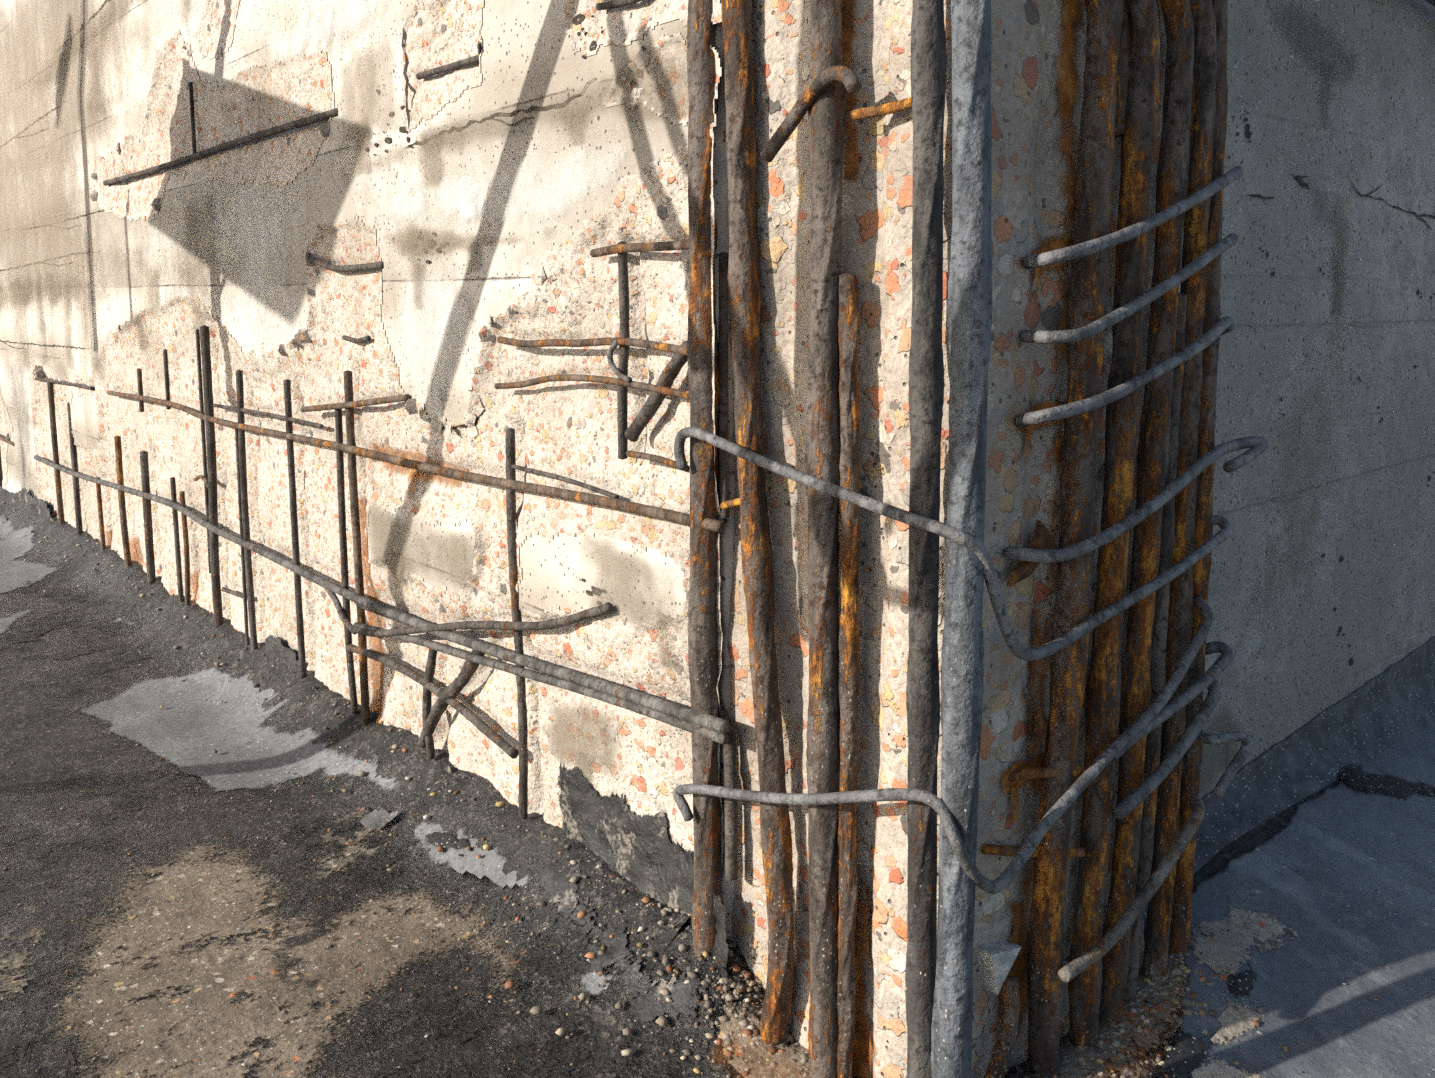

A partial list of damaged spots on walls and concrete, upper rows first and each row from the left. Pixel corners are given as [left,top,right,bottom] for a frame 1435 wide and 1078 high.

damp [0,0,101,295]
rust [1032,0,1082,301]
crack [1248,174,1310,204]
crack [1346,172,1435,229]
damp [404,286,464,354]
damp [368,509,467,584]
spalling [0,0,1228,958]
peeling [0,925,46,1000]
peeling [581,971,612,996]
rust [852,859,872,1078]
spalling [724,691,1298,1078]
rust [1007,857,1034,1041]